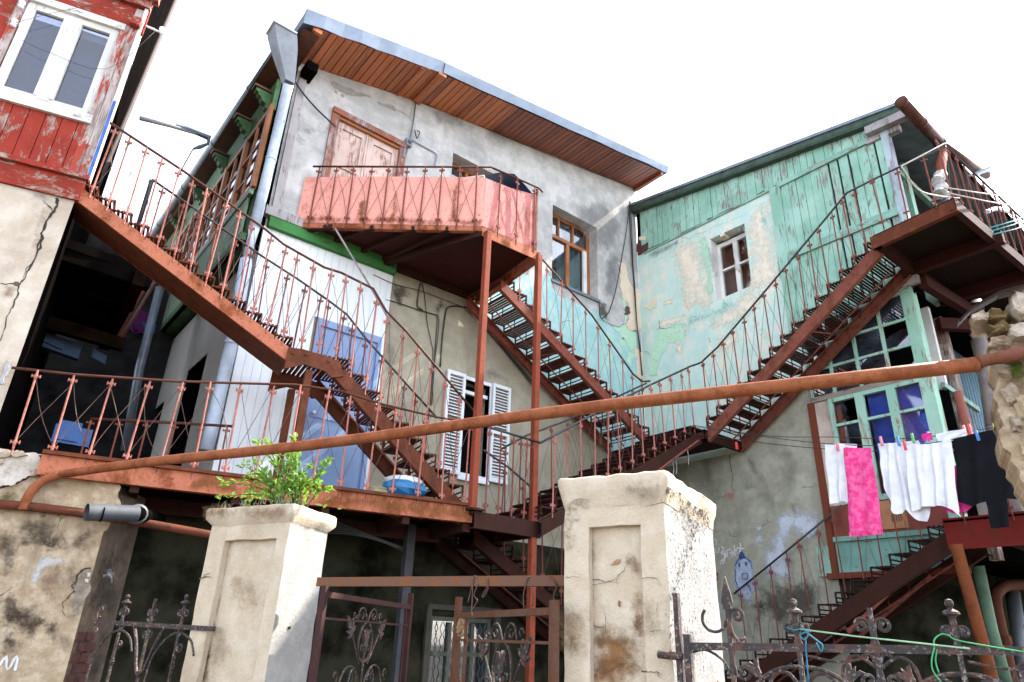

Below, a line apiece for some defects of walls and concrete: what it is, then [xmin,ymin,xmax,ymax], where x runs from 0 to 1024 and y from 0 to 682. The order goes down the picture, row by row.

crack [0,198,59,341]
peeling [478,206,777,457]
spalling [0,448,43,487]
leakage [5,598,55,633]
leakage [25,523,61,590]
peeling [73,569,93,616]
crack [566,554,661,678]
leakage [594,602,640,682]